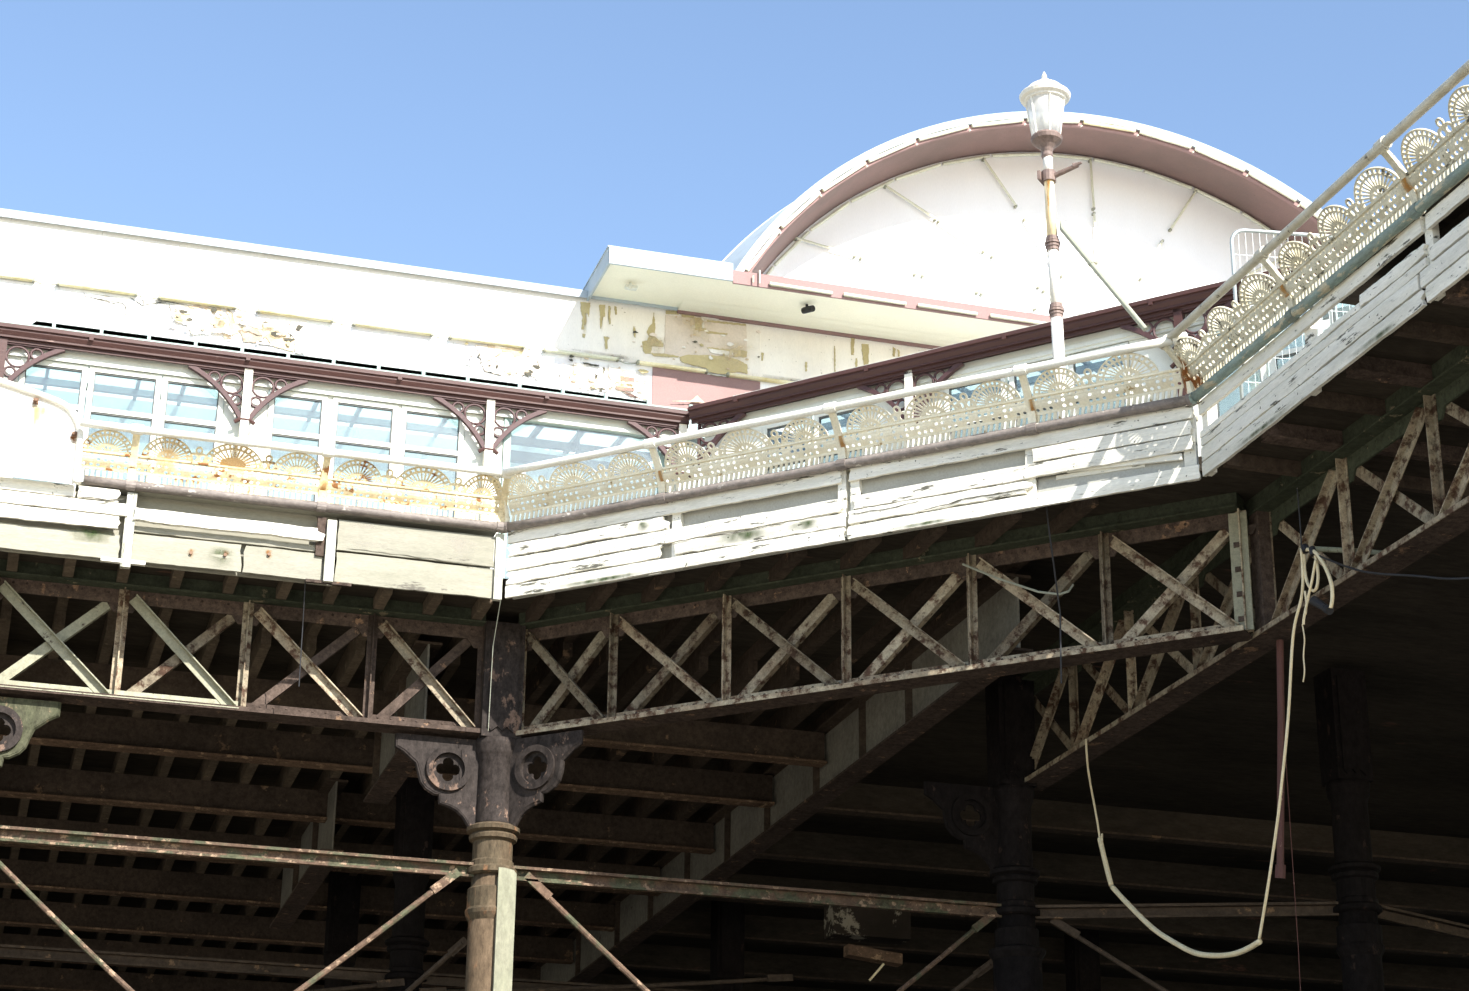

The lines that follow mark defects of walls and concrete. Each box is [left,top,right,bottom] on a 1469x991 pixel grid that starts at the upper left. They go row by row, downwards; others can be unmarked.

peeling [169,305,307,354]
peeling [463,310,761,400]